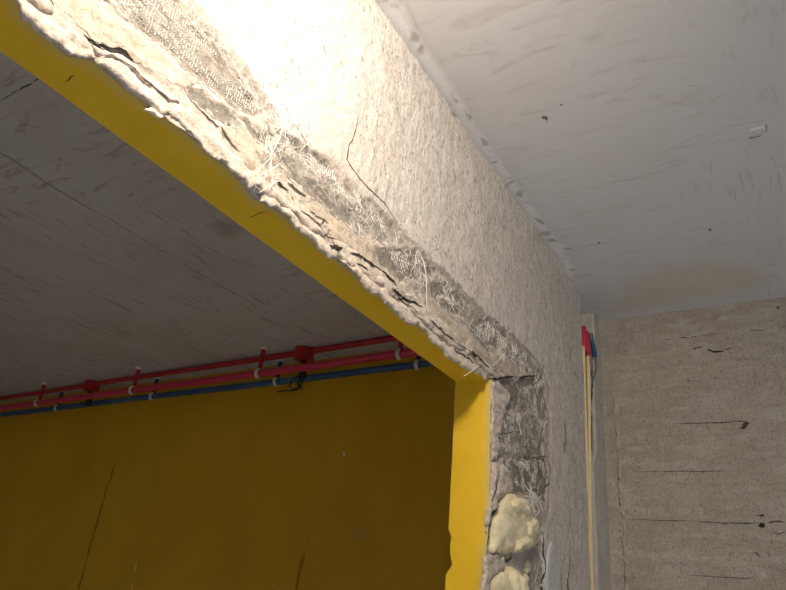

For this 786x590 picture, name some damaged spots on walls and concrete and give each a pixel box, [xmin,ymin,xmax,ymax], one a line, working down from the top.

crack [1,78,38,100]
crack [346,120,399,225]
spalling [15,0,549,533]
crack [675,418,748,426]
crack [617,467,785,548]
peeling [479,553,505,590]
spalling [523,529,544,590]
crack [691,573,755,581]